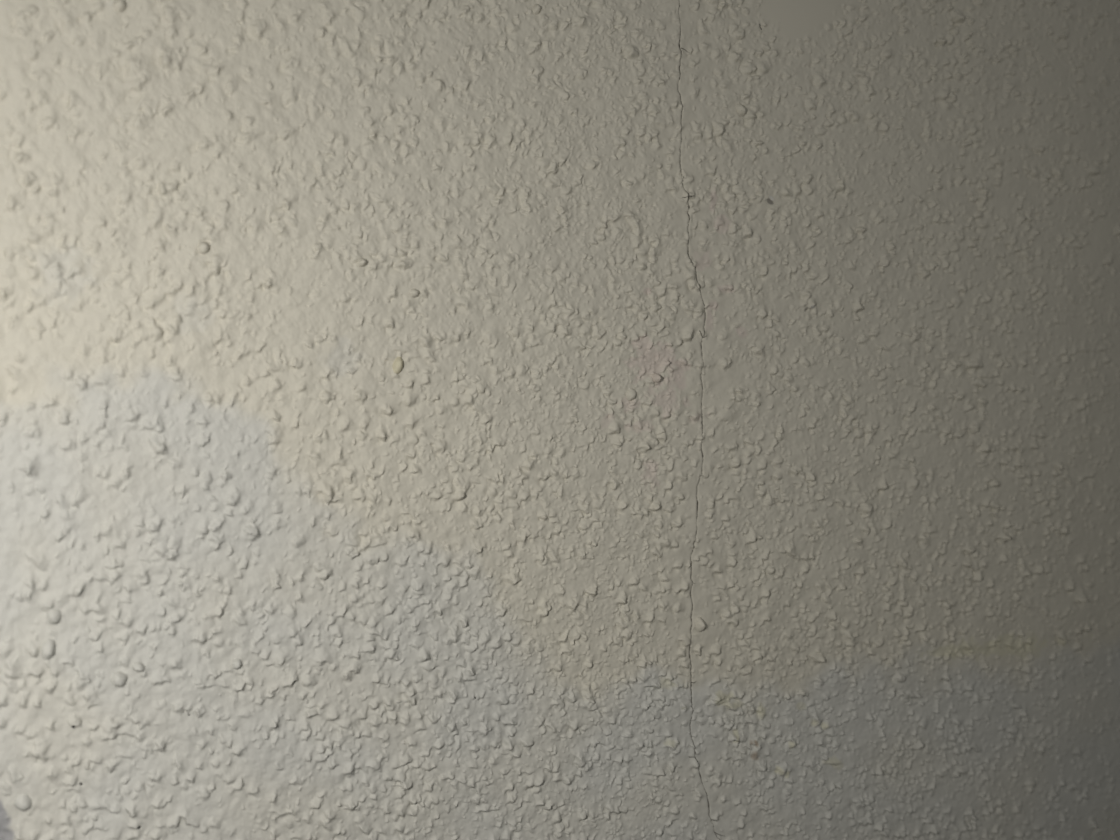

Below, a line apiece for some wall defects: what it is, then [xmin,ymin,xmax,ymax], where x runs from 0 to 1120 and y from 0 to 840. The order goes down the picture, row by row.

crack [678,4,723,836]